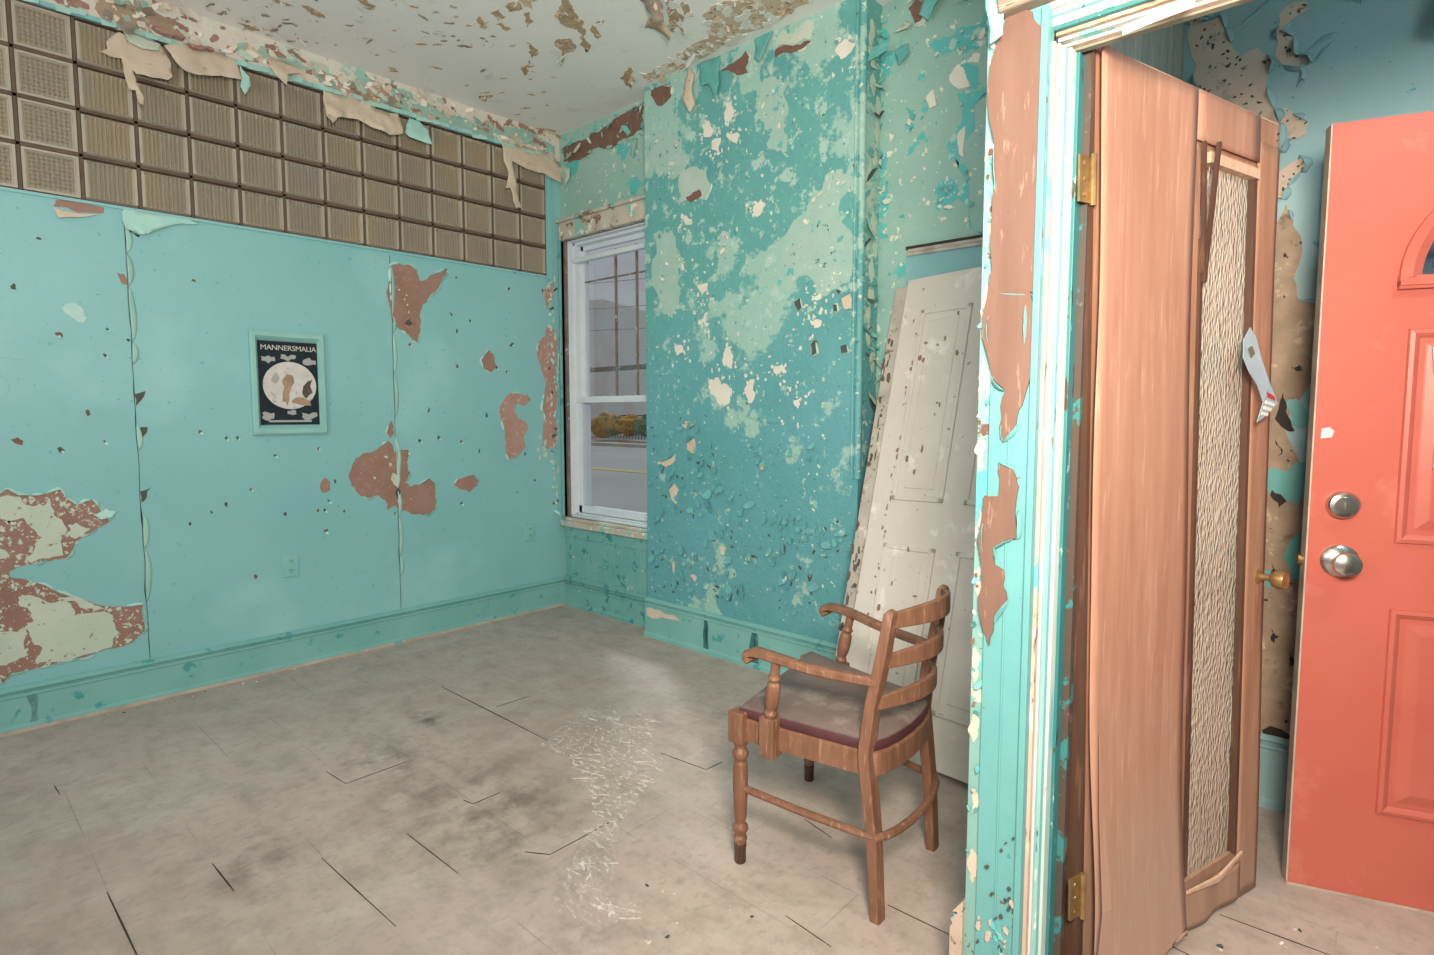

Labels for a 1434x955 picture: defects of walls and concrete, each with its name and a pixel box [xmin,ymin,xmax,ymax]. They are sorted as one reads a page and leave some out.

peeling [908,0,927,28]
peeling [777,12,938,410]
peeling [0,487,148,684]
peeling [317,420,442,535]
peeling [454,474,480,506]
peeling [486,276,562,518]
peeling [646,417,820,622]
peeling [929,10,1049,742]
flaking render [1122,0,1316,745]
peeling [967,765,980,815]
peeling [965,849,989,883]
spalling [975,887,1013,955]